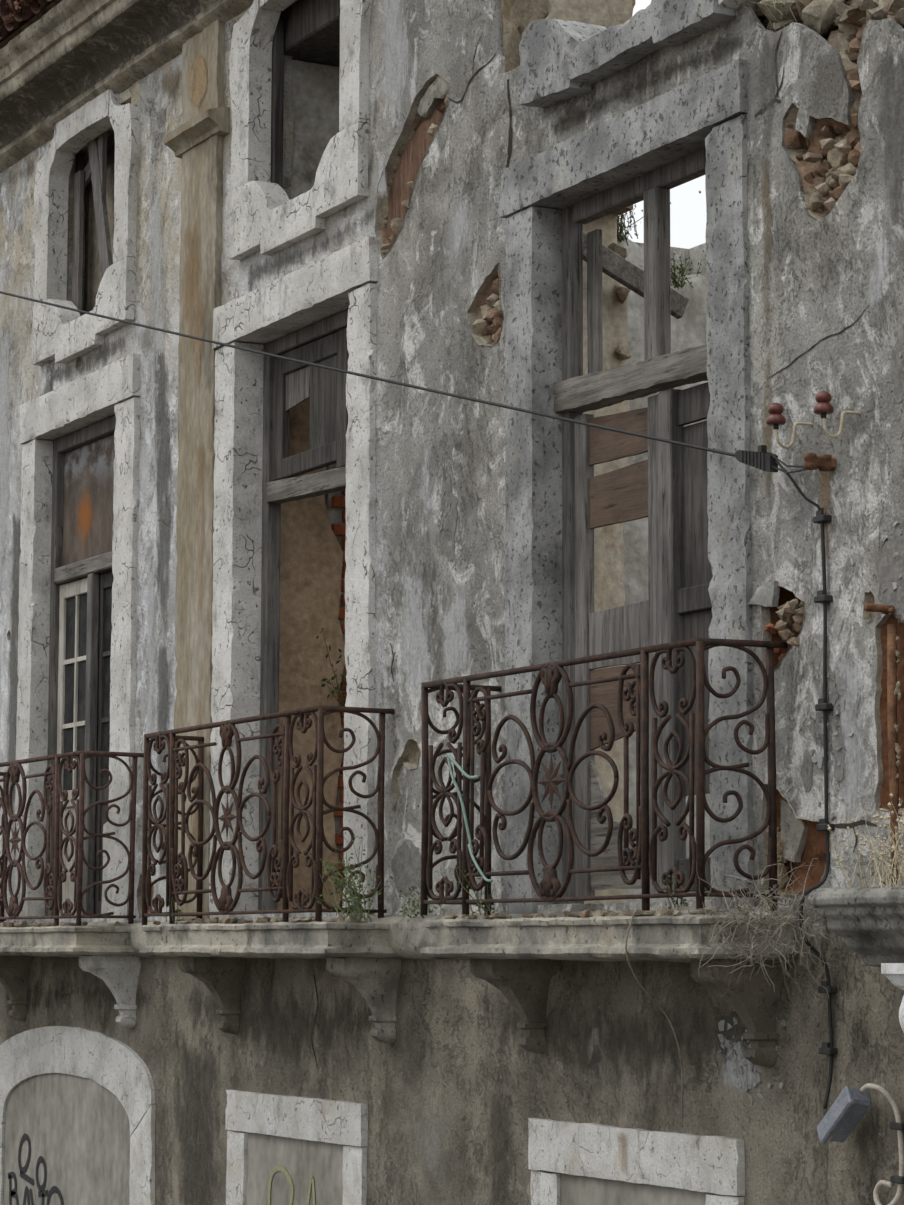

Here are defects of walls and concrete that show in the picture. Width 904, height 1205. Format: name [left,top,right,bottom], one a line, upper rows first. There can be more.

flaking render [784,10,874,221]
flaking render [375,73,450,260]
flaking render [467,263,504,346]
crack [769,305,869,379]
flaking render [748,581,805,669]
leakage [239,989,372,1060]
leakage [545,1006,750,1080]
leakage [178,1043,219,1205]
leakage [489,1098,511,1205]